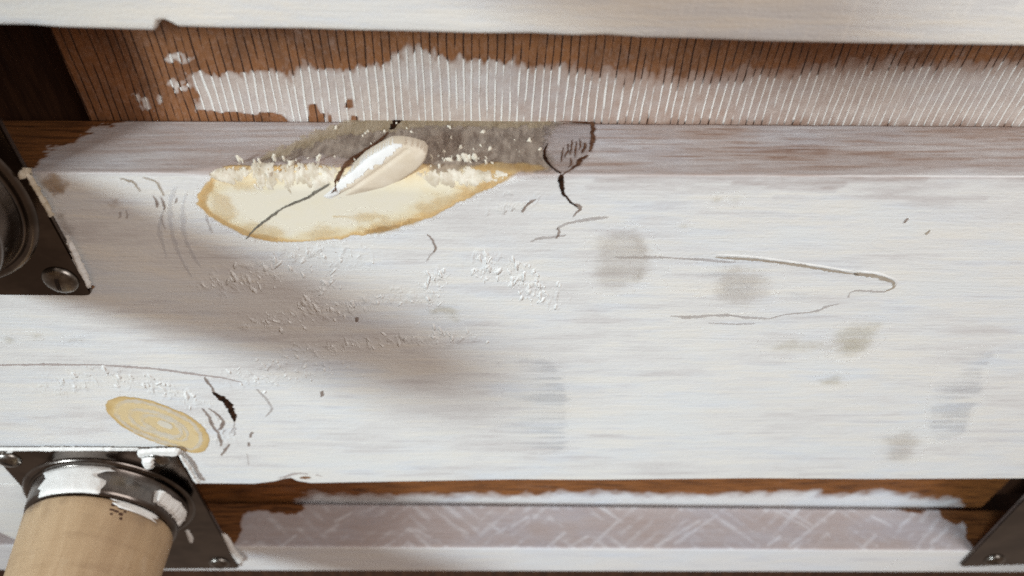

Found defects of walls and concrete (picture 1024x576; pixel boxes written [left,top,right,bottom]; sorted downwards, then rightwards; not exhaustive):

peeling [209,154,345,195]
peeling [416,125,508,188]
crack [543,121,596,239]
crack [716,254,898,292]
crack [201,378,253,456]